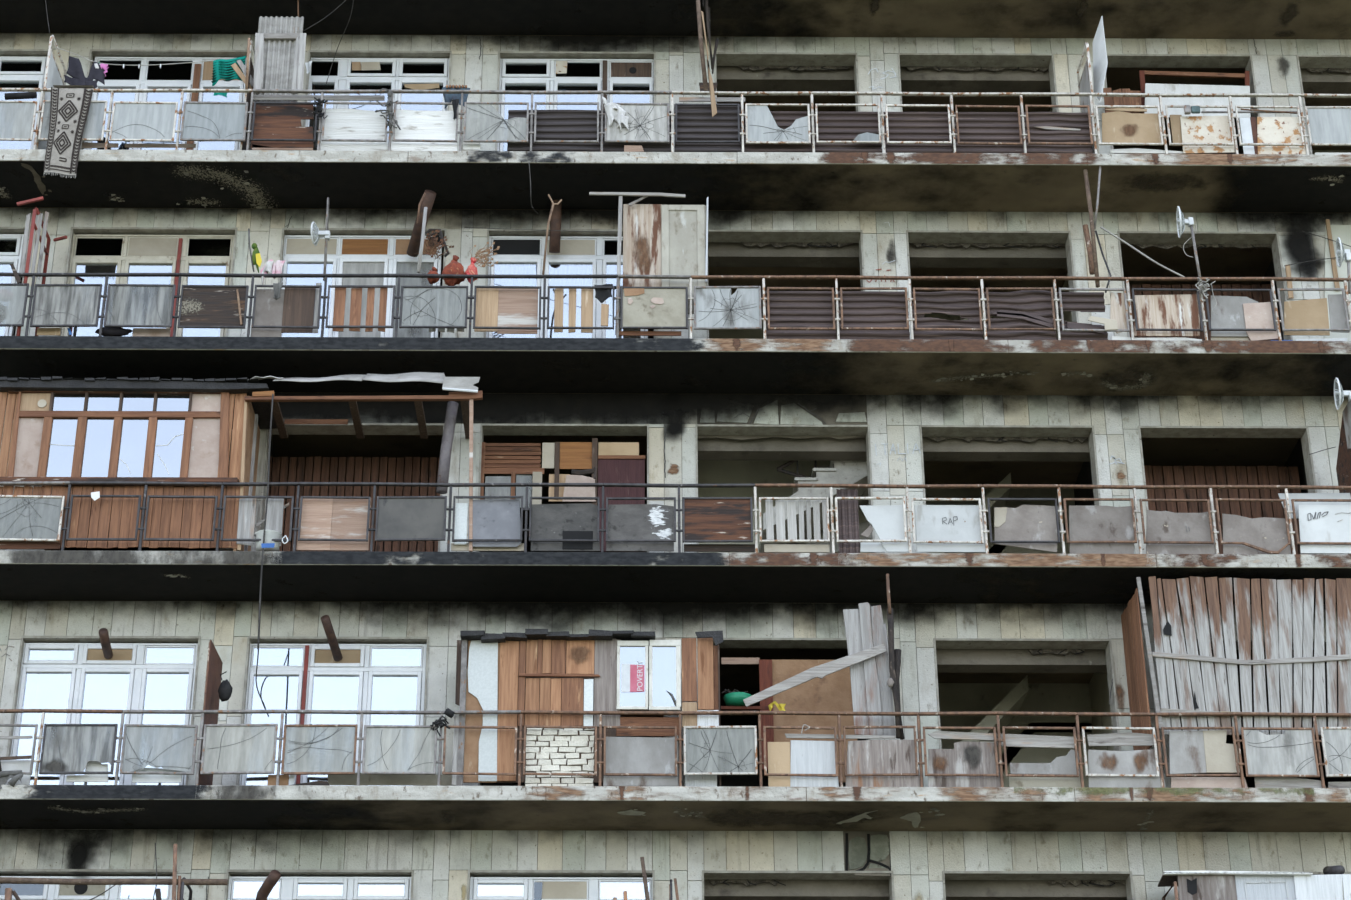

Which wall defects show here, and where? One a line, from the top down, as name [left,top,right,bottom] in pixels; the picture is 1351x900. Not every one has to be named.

rust [706,339,834,351]
rust [849,339,1351,353]
rust [723,553,1250,567]
rust [1295,554,1351,567]